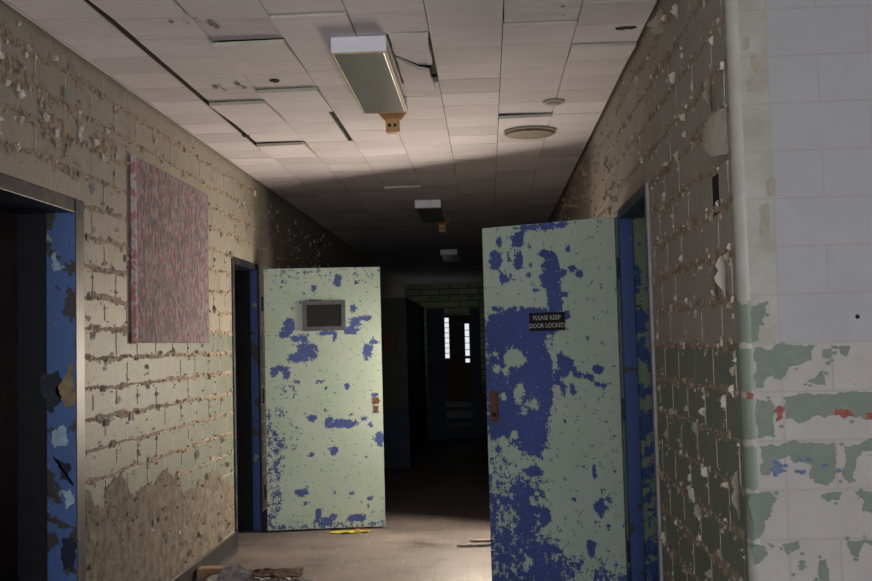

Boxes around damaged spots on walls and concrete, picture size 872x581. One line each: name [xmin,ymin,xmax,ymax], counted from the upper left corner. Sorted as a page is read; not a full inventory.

peeling [0,22,331,581]
peeling [553,0,872,581]